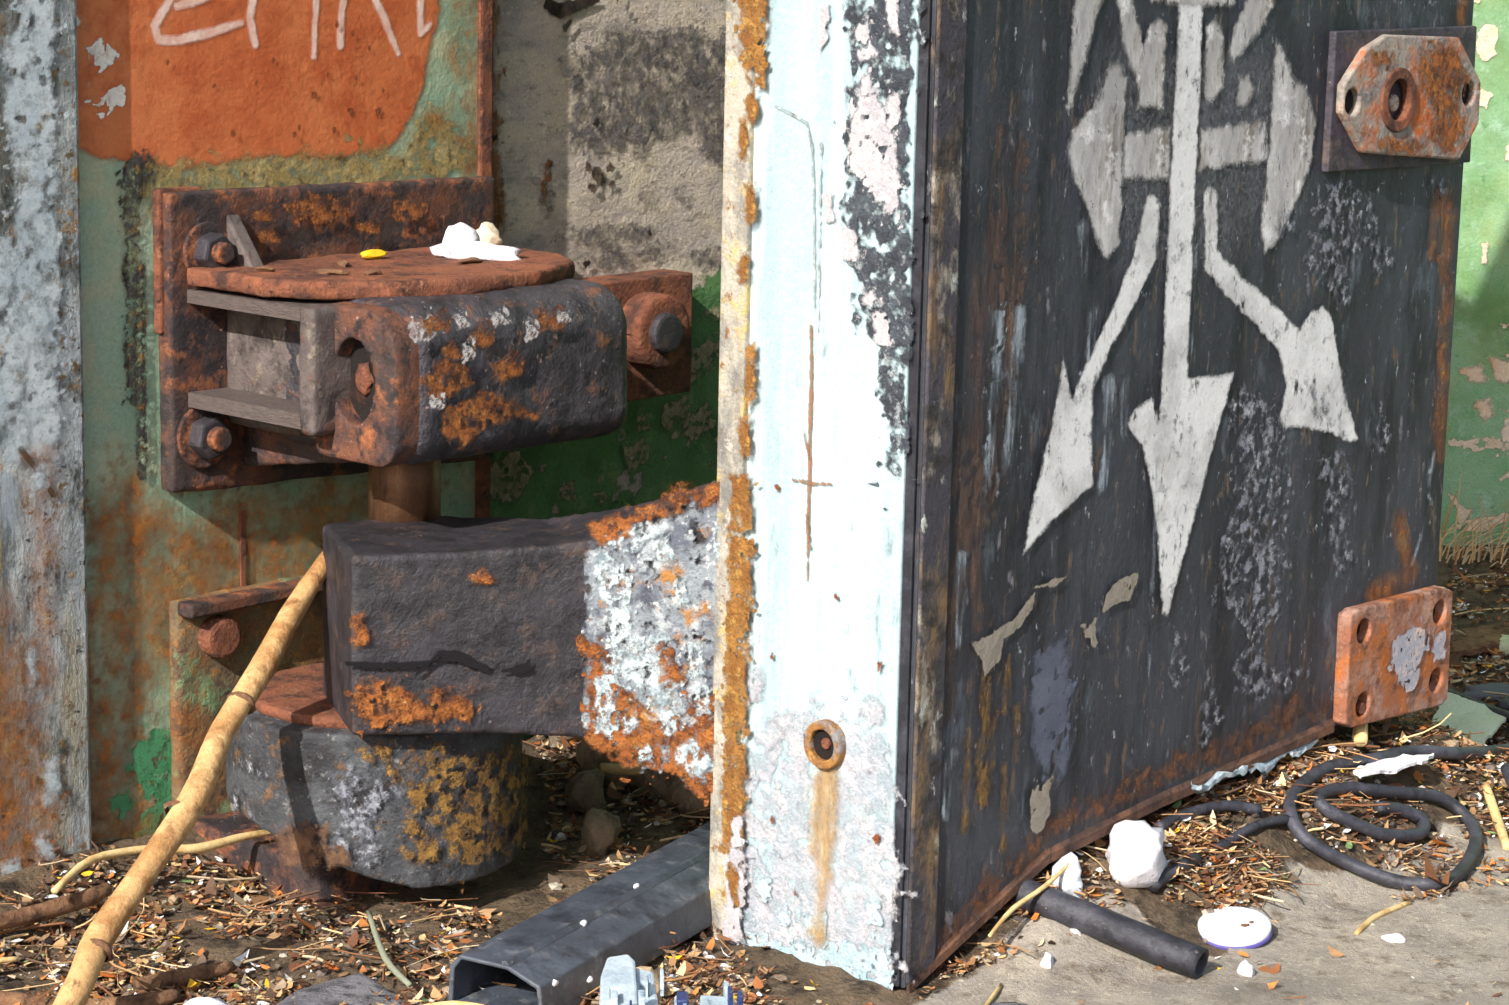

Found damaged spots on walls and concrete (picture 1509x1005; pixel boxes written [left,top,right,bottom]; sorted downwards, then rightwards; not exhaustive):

rust [732,0,768,159]
peeling [1479,89,1493,109]
peeling [1476,24,1498,61]
rust [736,254,750,284]
rust [744,182,757,226]
peeling [817,0,928,486]
rust [417,308,538,446]
peeling [1459,354,1509,457]
peeling [971,576,1066,676]
peeling [1022,572,1138,834]
rust [344,674,528,894]
rust [266,819,351,872]